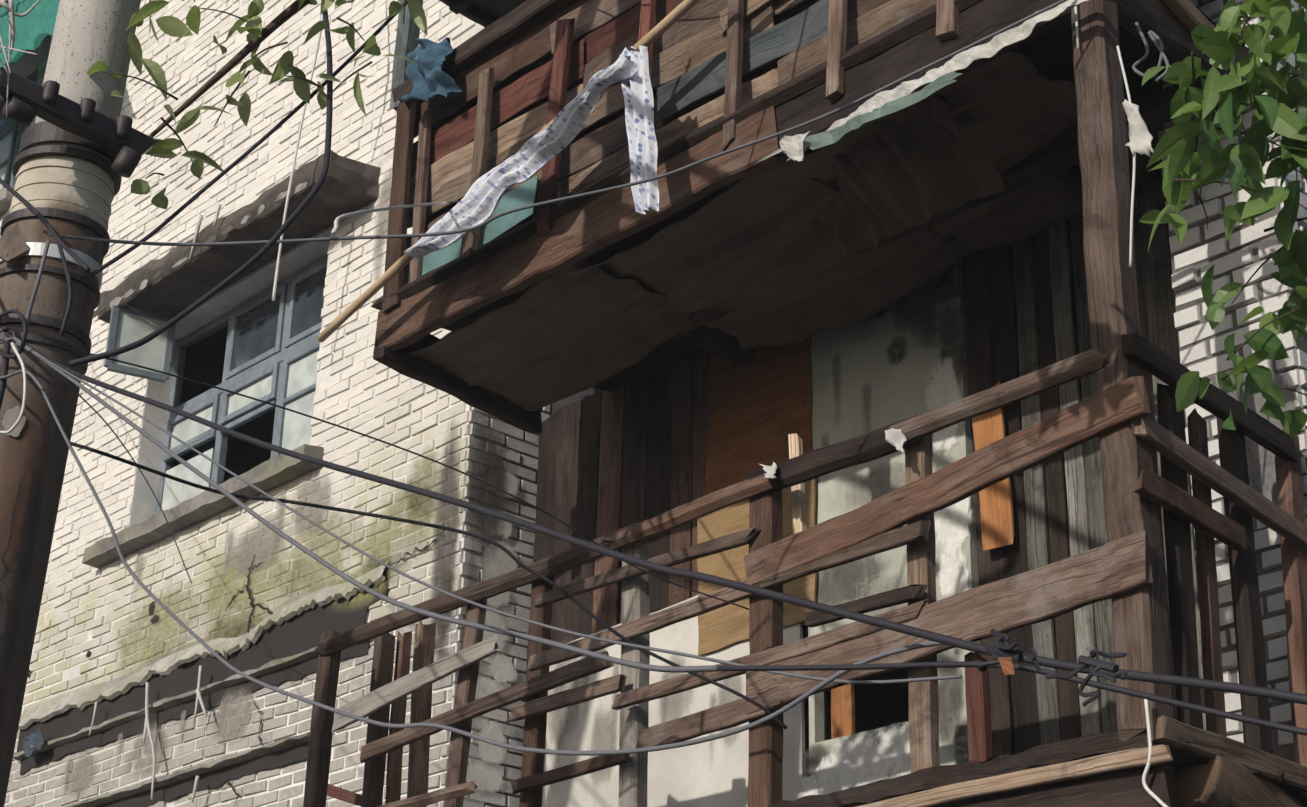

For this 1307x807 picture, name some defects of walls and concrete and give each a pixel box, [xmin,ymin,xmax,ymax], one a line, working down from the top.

mould [865,269,966,381]
damp [225,480,327,569]
damp [854,467,905,504]
crack [225,556,273,646]
damp [816,557,908,616]